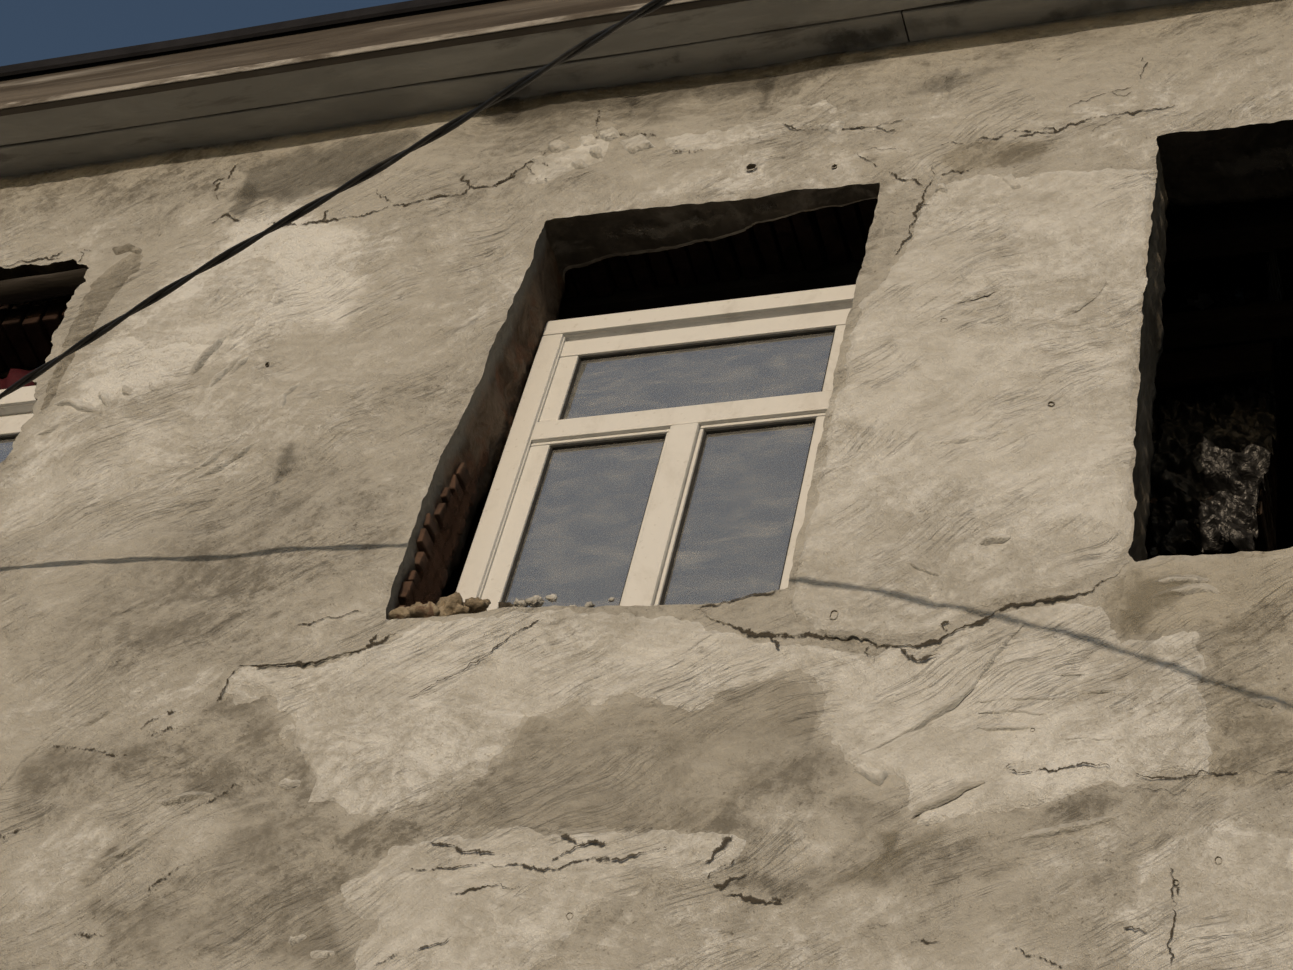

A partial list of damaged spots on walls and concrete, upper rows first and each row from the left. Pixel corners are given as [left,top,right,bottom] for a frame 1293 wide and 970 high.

crack [212,165,239,223]
crack [273,150,588,226]
crack [596,110,703,153]
crack [782,58,1175,254]
crack [694,557,1131,661]
crack [1006,762,1293,795]
crack [411,834,666,894]
crack [705,836,786,905]
crack [1125,868,1180,963]
crack [379,939,448,963]